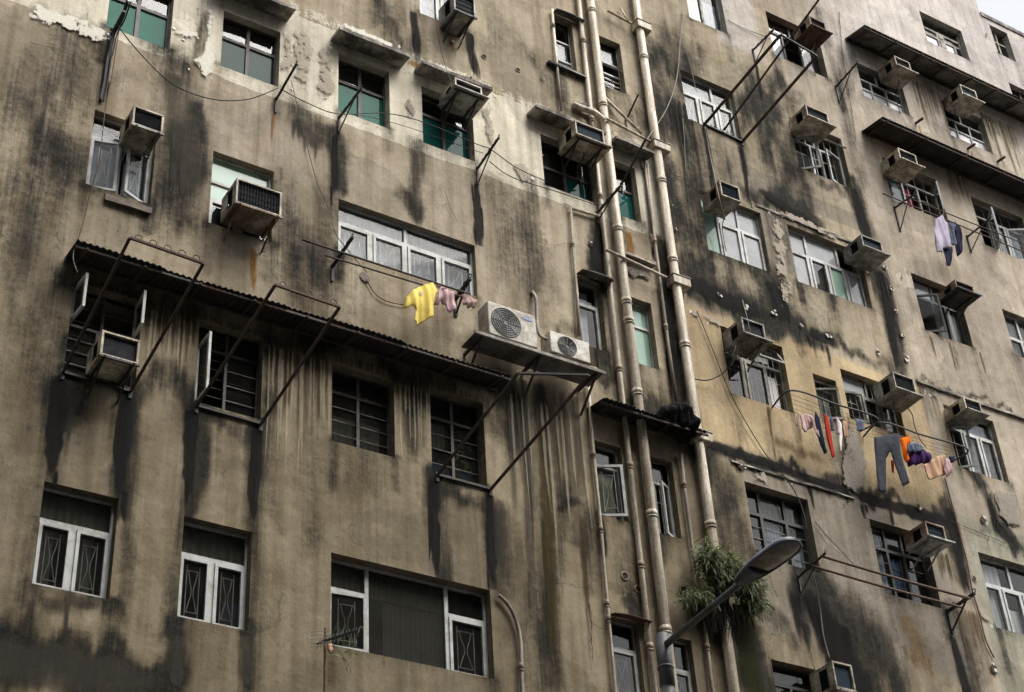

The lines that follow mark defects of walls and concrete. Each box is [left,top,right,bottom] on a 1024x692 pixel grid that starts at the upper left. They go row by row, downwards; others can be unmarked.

peeling [29,3,111,41]
peeling [173,6,215,80]
peeling [281,30,335,100]
leakage [739,147,812,227]
leakage [851,188,871,237]
peeling [768,208,844,316]
leakage [870,269,899,367]
leakage [113,391,136,520]
leakage [183,410,199,503]
leakage [247,426,263,518]
leakage [428,478,440,575]
leakage [709,441,969,589]